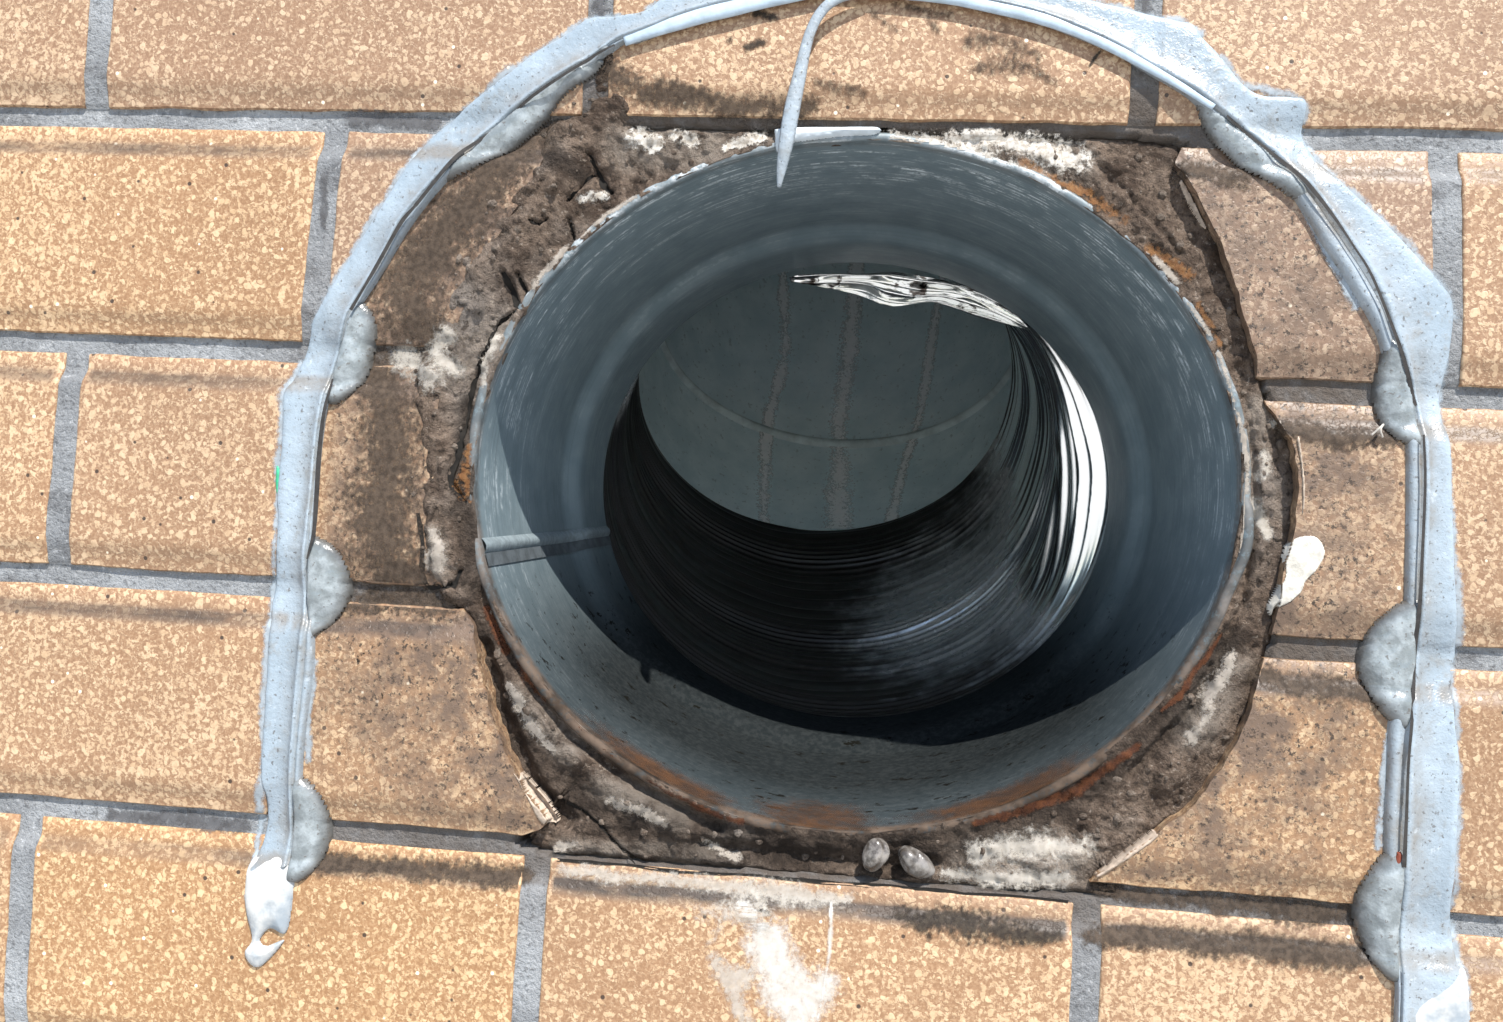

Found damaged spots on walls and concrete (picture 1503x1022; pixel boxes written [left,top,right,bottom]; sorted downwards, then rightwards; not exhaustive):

rust [483,605,546,702]
rust [1161,634,1222,712]
rust [603,735,745,825]
rust [933,743,1141,827]
damp [565,865,852,1022]